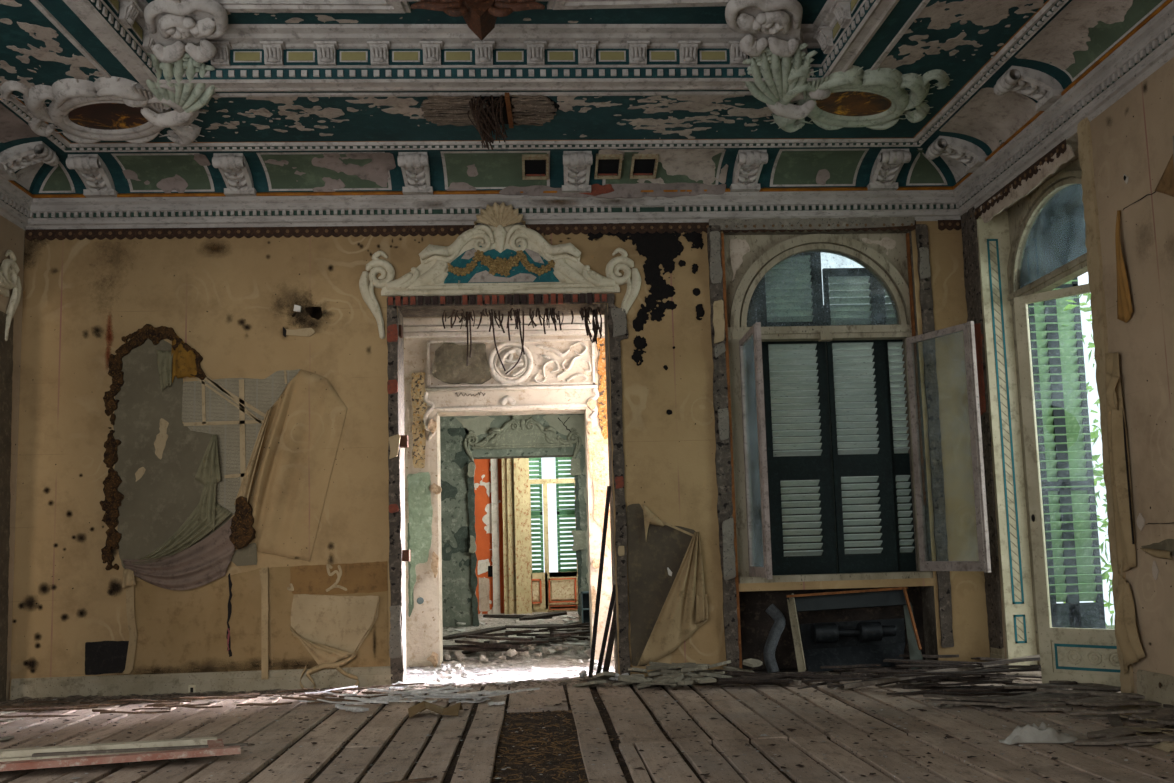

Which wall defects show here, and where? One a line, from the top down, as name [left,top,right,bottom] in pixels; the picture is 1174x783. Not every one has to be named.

peeling [0,0,103,89]
peeling [878,0,1044,69]
peeling [1015,0,1133,70]
peeling [123,170,188,193]
peeling [199,97,429,138]
peeling [265,153,396,192]
peeling [499,95,775,199]
mould [587,222,705,366]
peeling [154,418,169,459]